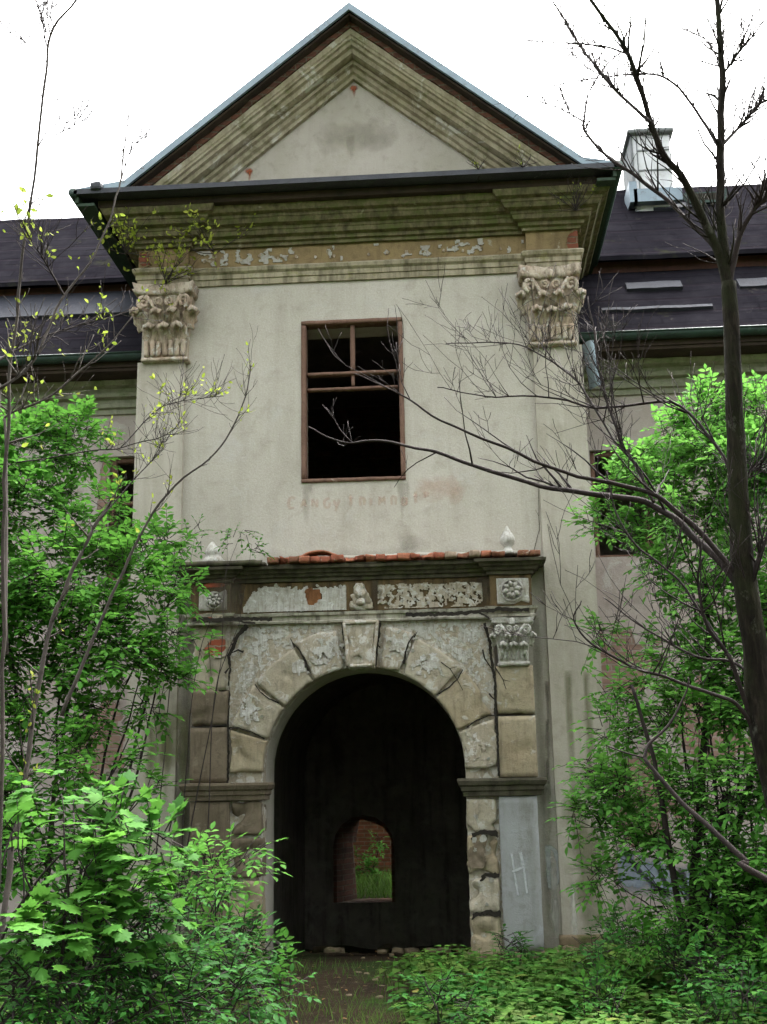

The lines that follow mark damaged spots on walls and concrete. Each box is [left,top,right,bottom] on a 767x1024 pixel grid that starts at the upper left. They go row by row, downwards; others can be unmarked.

peeling [197,247,298,267]
peeling [377,582,483,609]
peeling [199,583,347,727]
peeling [379,620,489,690]
crack [193,624,249,783]
spalling [466,834,494,883]